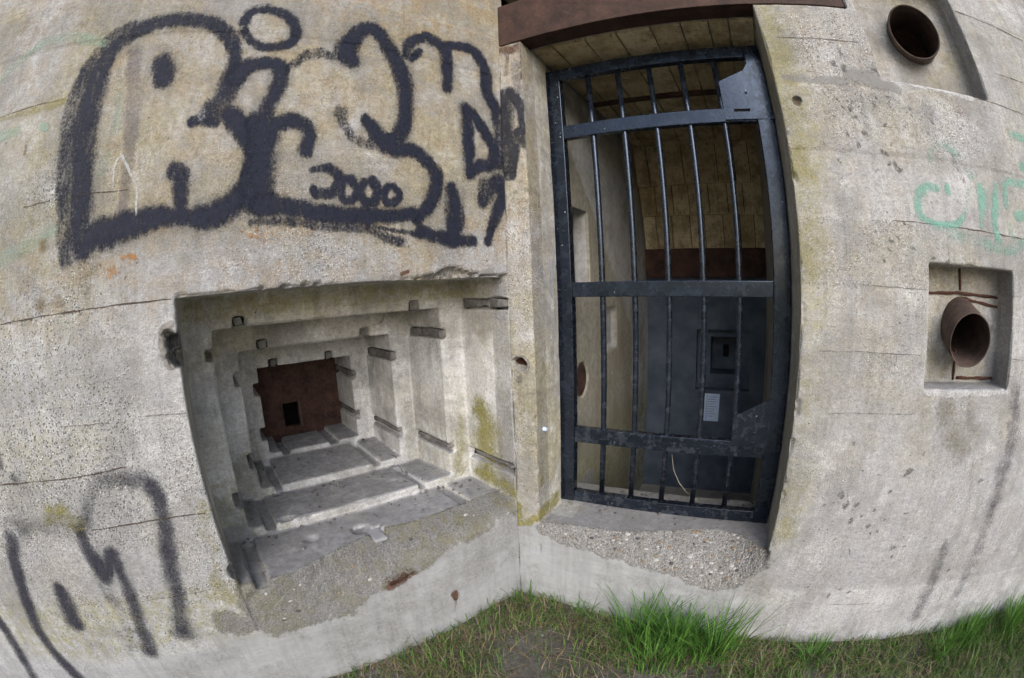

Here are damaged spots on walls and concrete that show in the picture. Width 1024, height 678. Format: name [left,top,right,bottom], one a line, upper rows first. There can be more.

crack [0,299,170,325]
spalling [158,320,178,370]
rust [384,569,417,590]
spalling [537,519,775,591]